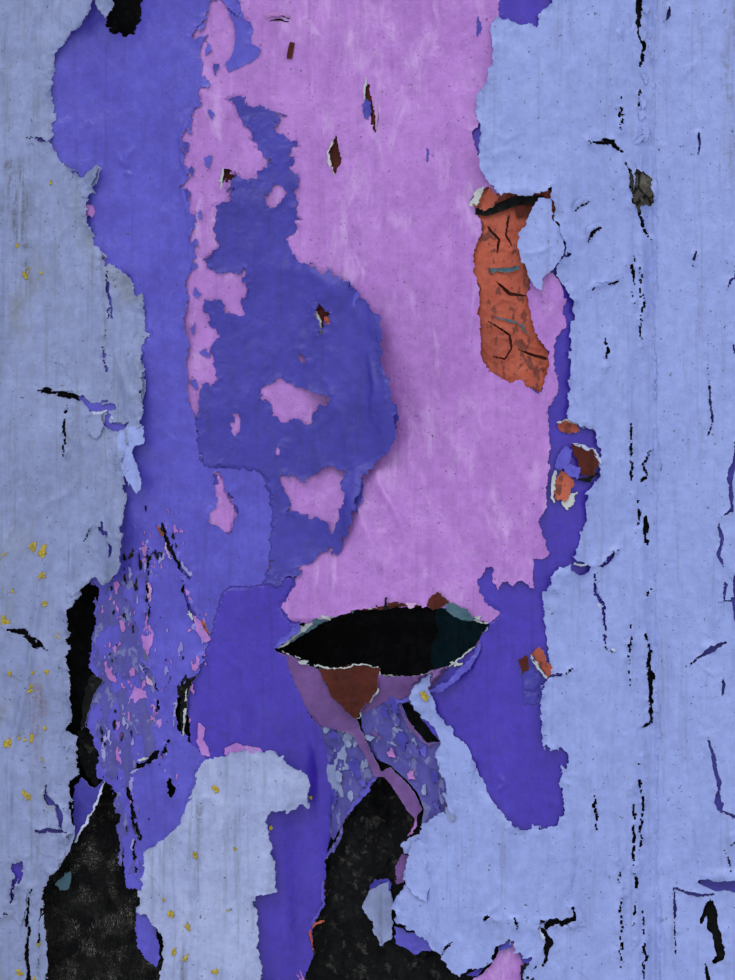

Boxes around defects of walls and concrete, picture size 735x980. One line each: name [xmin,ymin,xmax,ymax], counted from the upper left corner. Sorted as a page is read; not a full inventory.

crack [589,227,602,240]
crack [608,256,646,340]
crack [39,387,122,457]
crack [706,364,714,436]
peeling [31,0,618,980]
crack [629,423,654,544]
crack [716,443,735,620]
crack [691,642,726,664]
crack [591,795,599,830]
crack [708,740,735,818]
crack [618,763,648,979]
crack [673,842,735,980]